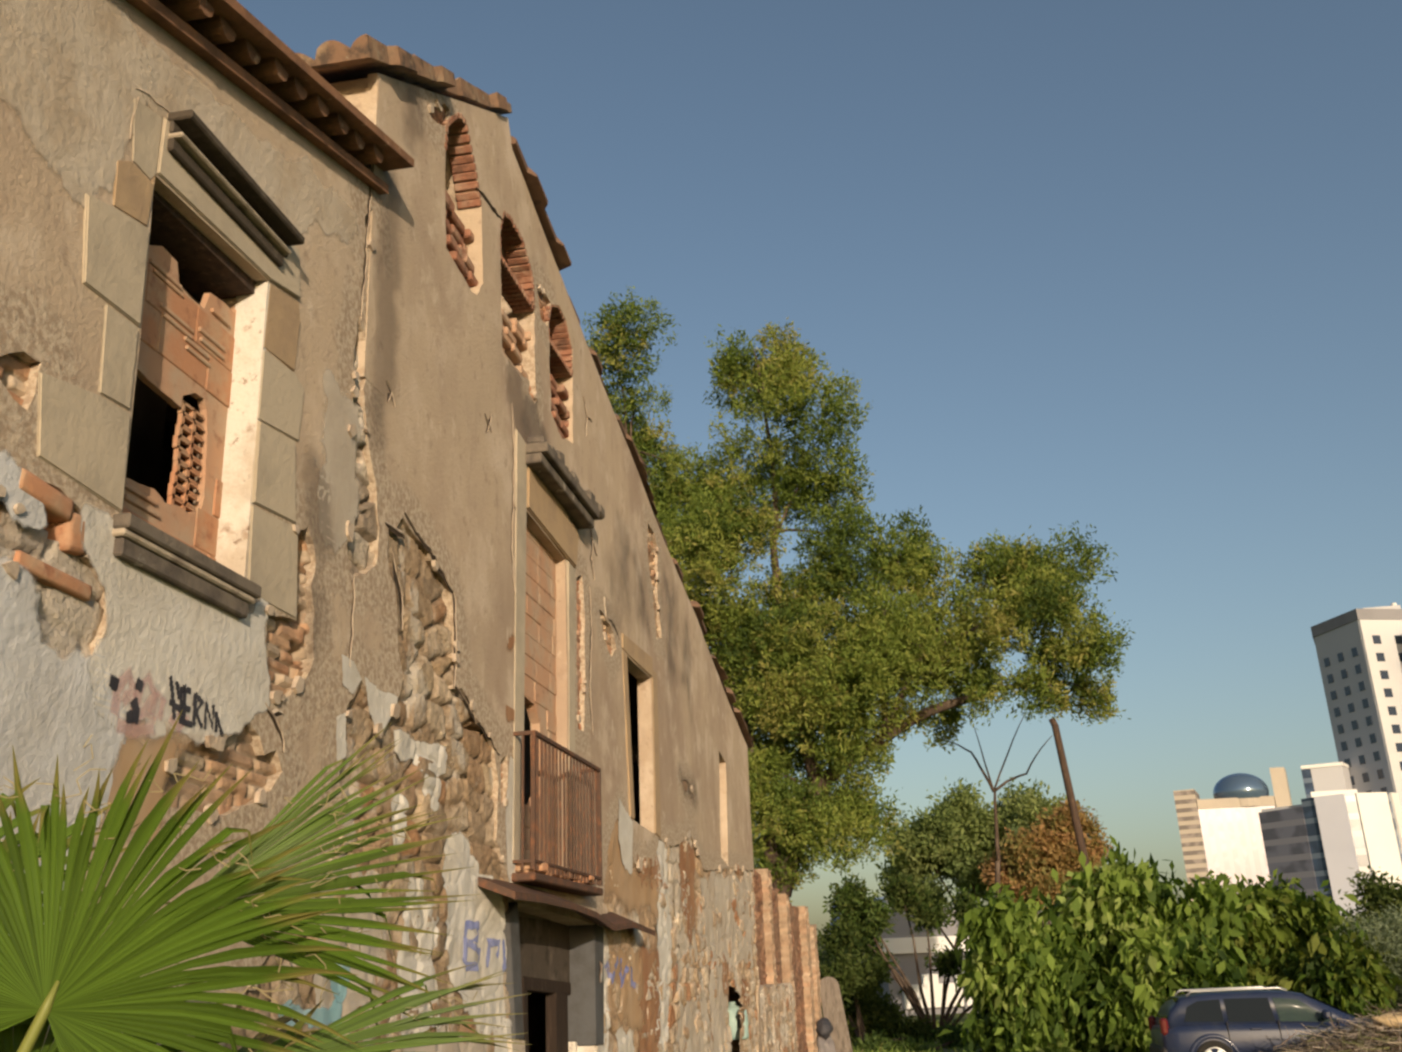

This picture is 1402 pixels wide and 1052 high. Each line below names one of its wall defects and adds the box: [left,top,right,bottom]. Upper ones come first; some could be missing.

crack [360,164,372,321]
spalling [0,354,33,406]
spalling [167,401,204,512]
peeling [0,450,311,846]
crack [348,577,356,660]
spalling [226,331,519,1052]
spalling [597,798,760,1052]